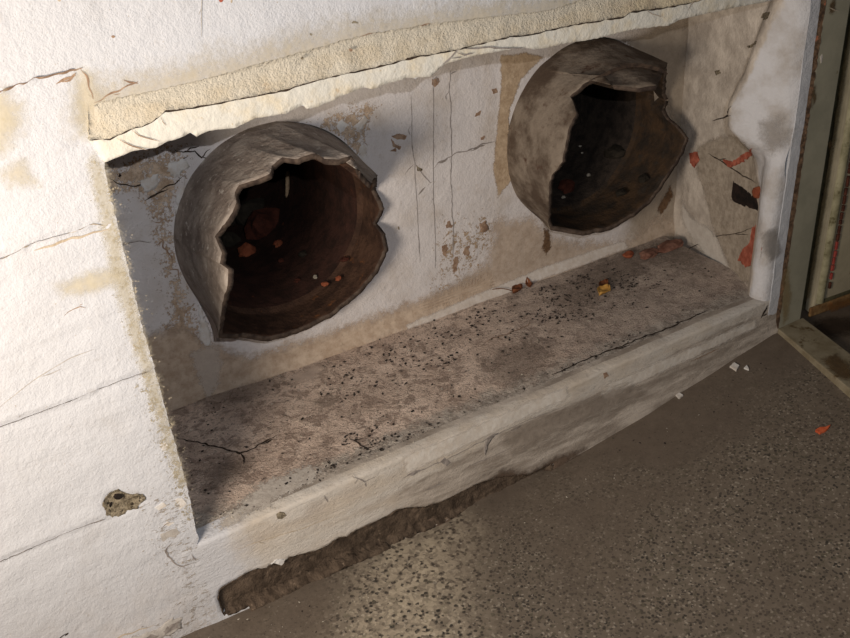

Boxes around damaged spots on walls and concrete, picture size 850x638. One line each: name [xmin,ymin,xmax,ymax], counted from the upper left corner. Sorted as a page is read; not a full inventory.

crack [0,68,138,103]
peeling [87,0,772,347]
rust [657,185,673,214]
crack [552,311,705,375]
peeling [102,251,211,638]
crack [176,435,277,463]
flaking render [217,464,554,616]